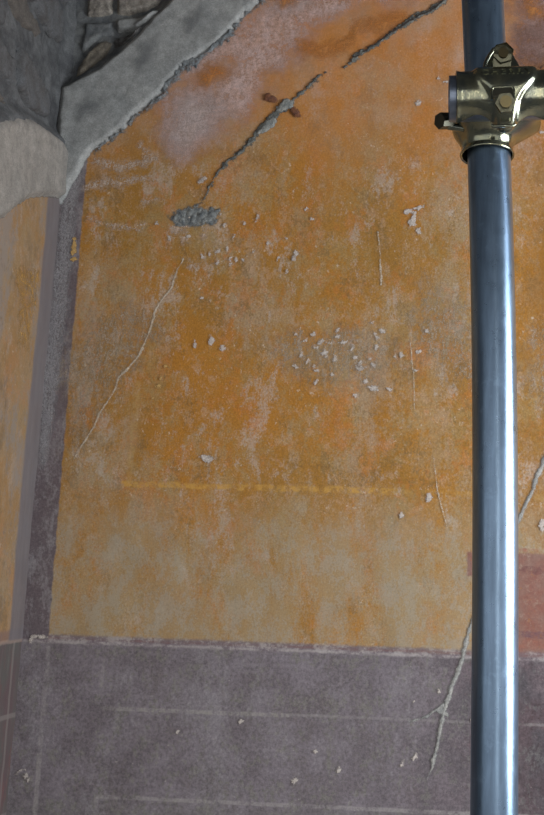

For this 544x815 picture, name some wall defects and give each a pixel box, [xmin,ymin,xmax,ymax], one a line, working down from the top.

crack [202,0,447,200]
spalling [167,202,226,242]
crack [75,258,184,457]
crack [518,457,544,524]
crack [409,619,472,774]